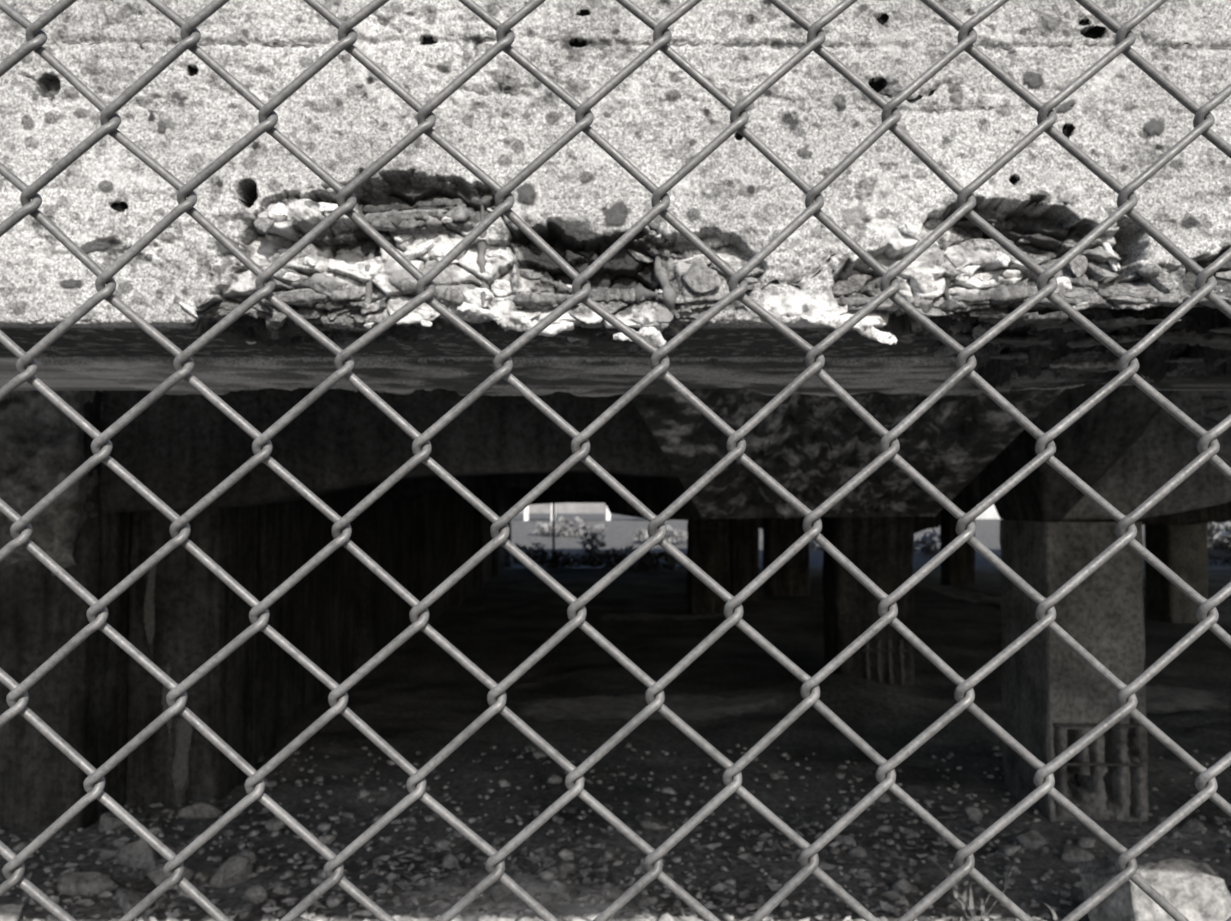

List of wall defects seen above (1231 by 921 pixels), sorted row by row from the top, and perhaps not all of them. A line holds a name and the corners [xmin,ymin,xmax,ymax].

spalling [179,175,765,357]
spalling [832,202,1231,437]